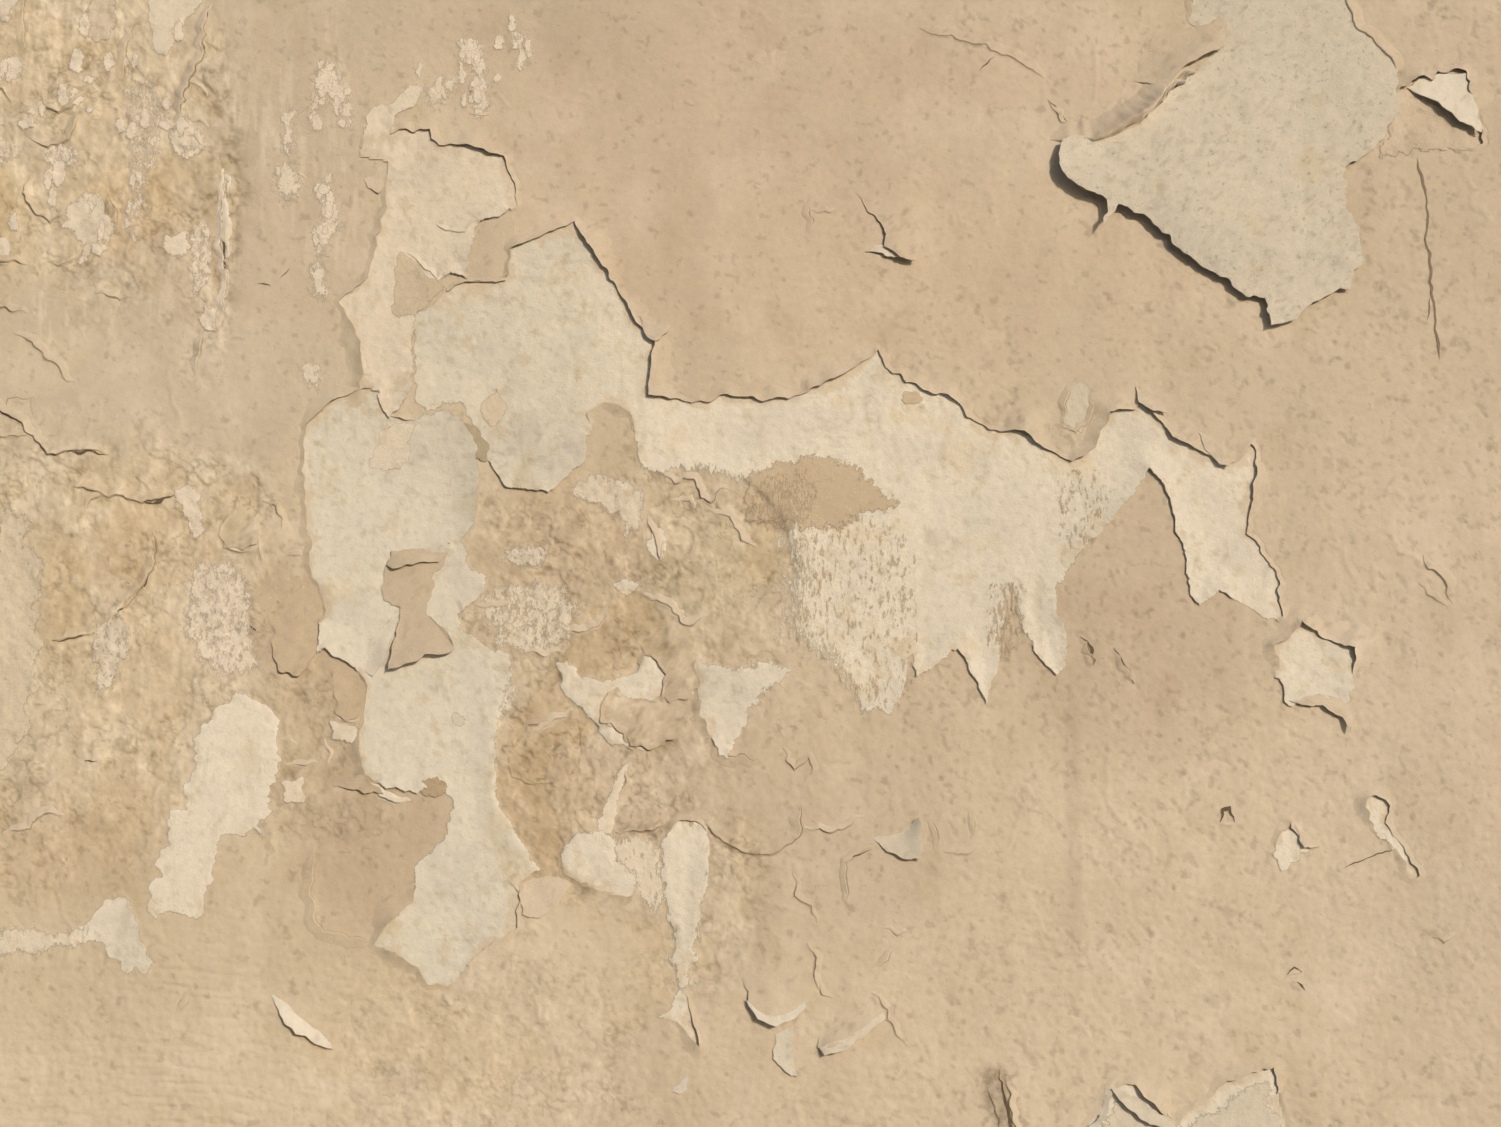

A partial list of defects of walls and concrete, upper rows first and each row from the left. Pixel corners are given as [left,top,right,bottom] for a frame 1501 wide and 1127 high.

spalling [1380,60,1494,159]
crack [1417,157,1440,359]
peeling [77,84,1382,1094]
peeling [1048,1055,1288,1127]